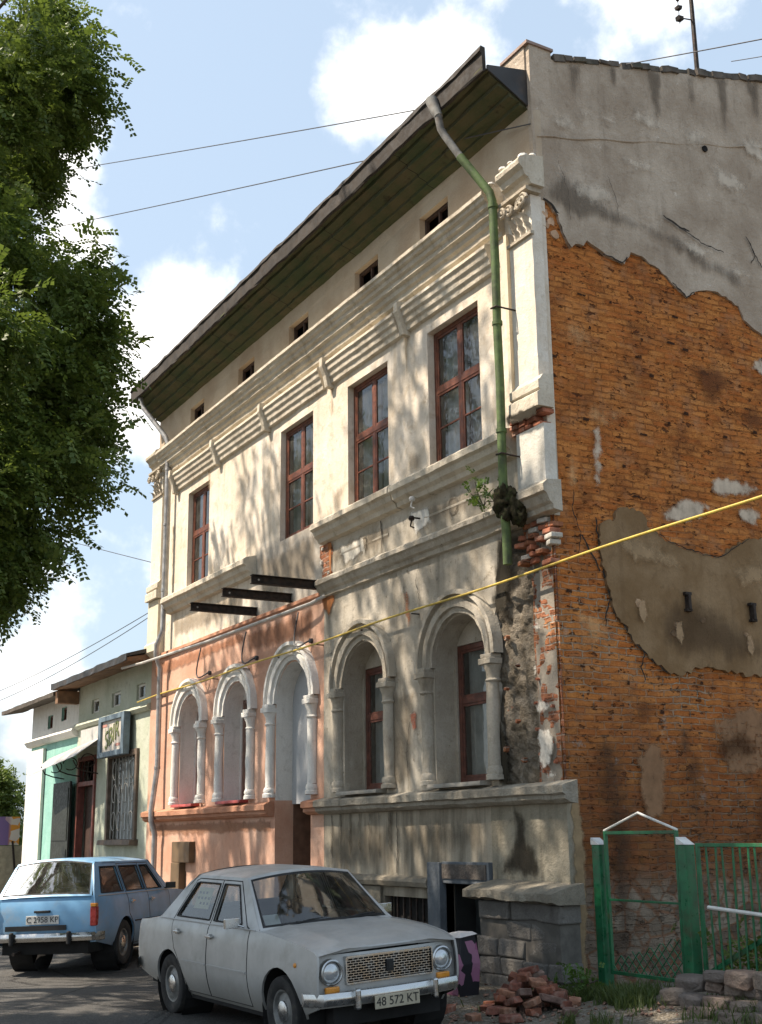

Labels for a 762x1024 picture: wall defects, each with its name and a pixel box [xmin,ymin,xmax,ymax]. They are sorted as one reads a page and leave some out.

crack [663,215,724,253]
flaking render [320,538,363,578]
flaking render [497,203,762,989]
leakage [504,815,538,876]